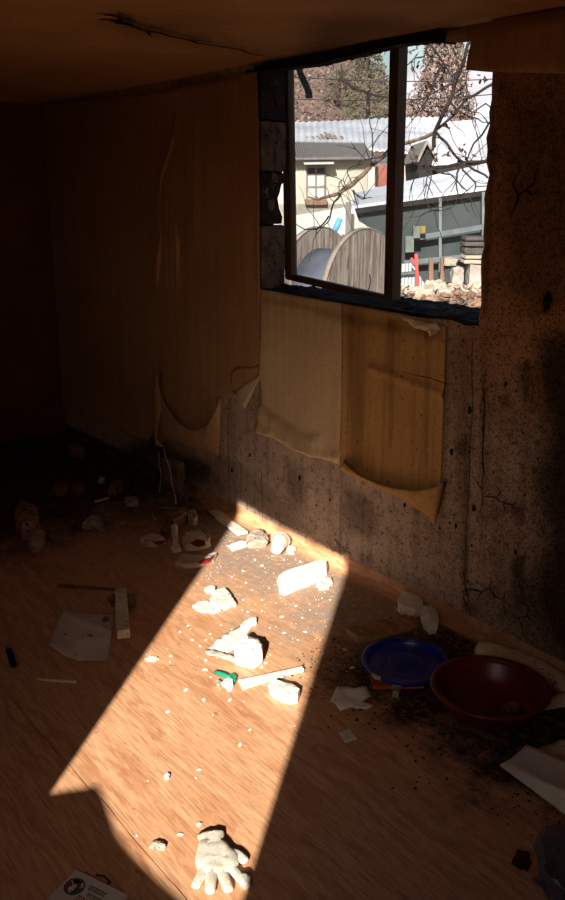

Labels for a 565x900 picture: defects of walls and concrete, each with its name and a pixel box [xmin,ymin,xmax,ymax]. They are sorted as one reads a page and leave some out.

crack [100,15,308,64]
crack [511,168,540,216]
crack [465,372,519,555]
crack [463,577,536,628]